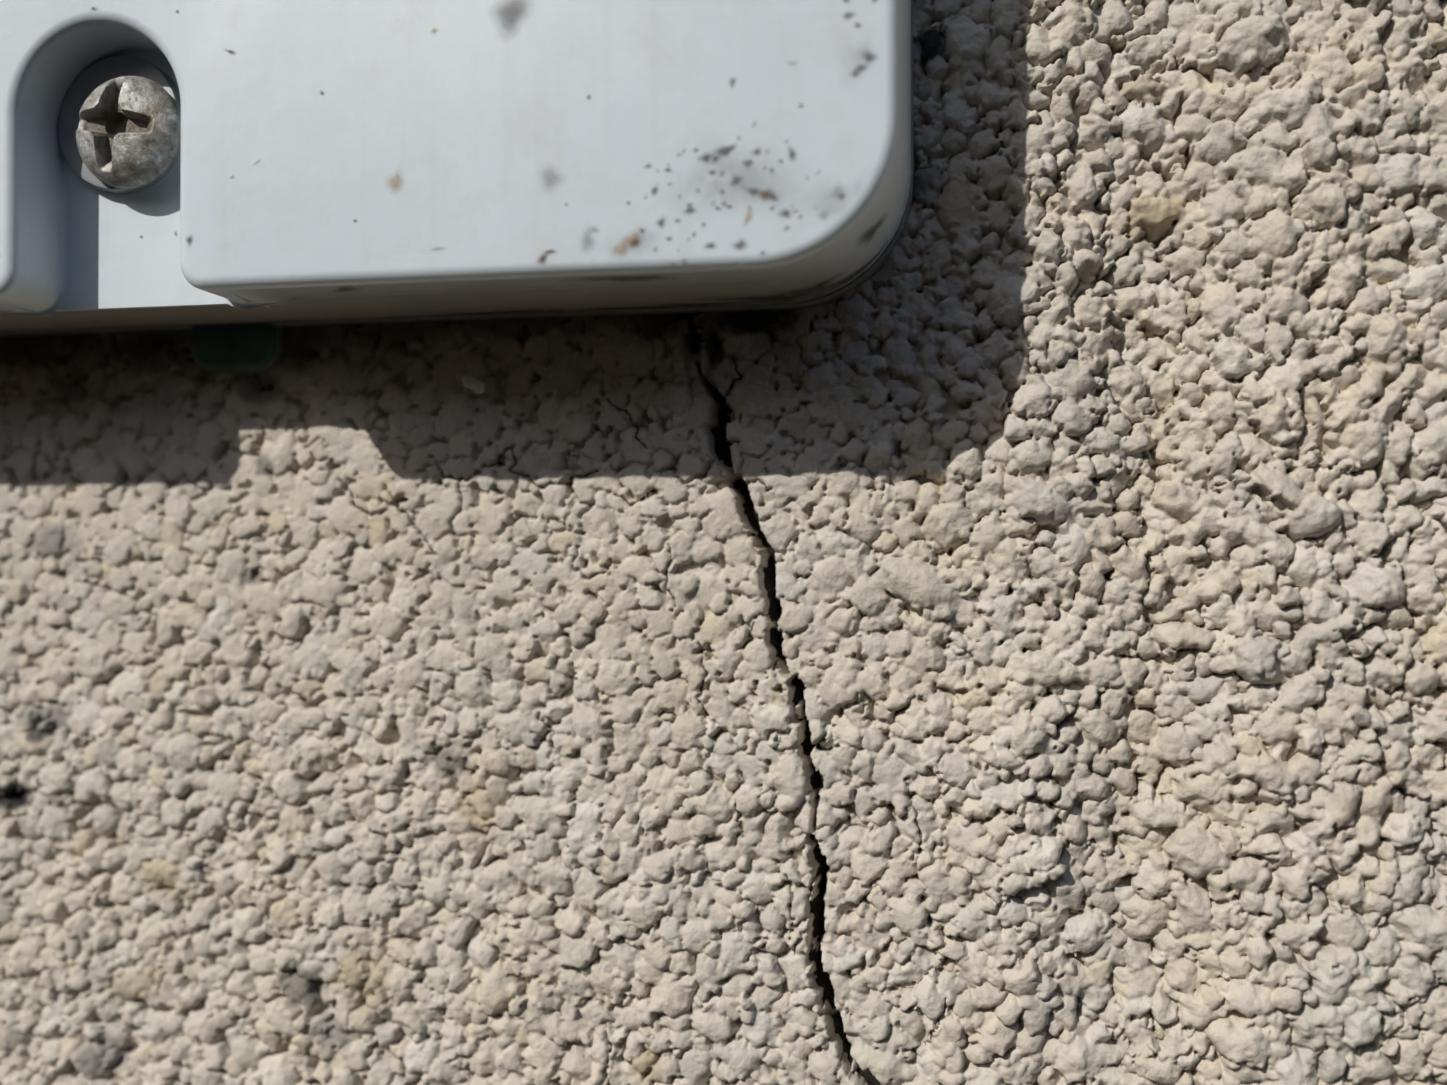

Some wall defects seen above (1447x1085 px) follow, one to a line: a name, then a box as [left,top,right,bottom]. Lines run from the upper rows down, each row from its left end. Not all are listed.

crack [696,365,840,800]
crack [735,801,744,846]
crack [910,796,922,861]
crack [786,834,881,1085]
crack [925,997,947,1045]